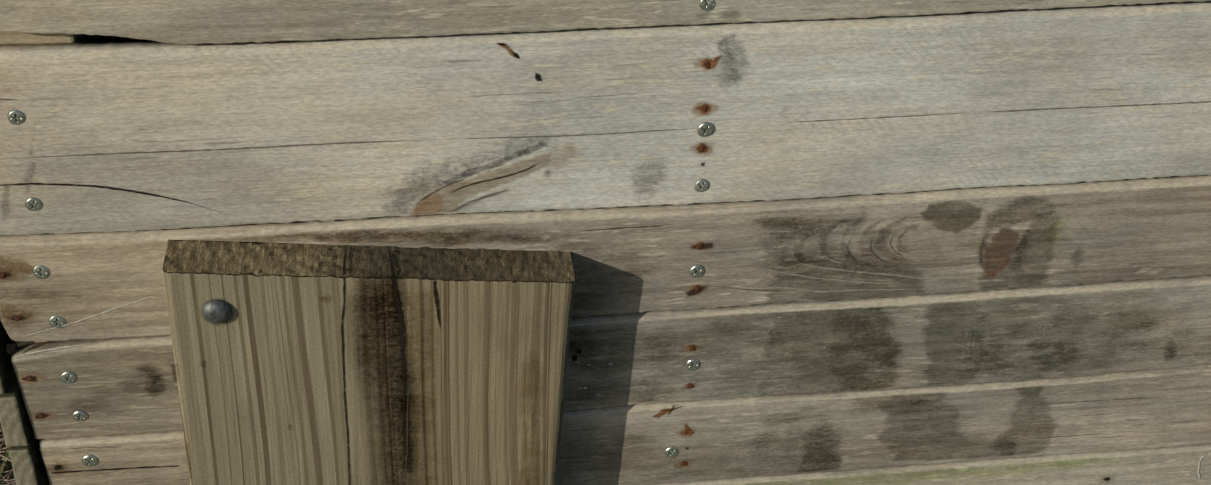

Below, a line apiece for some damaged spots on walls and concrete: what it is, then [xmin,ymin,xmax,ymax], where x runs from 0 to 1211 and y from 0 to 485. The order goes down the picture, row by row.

crack [341,247,350,485]
water stain [355,283,411,485]